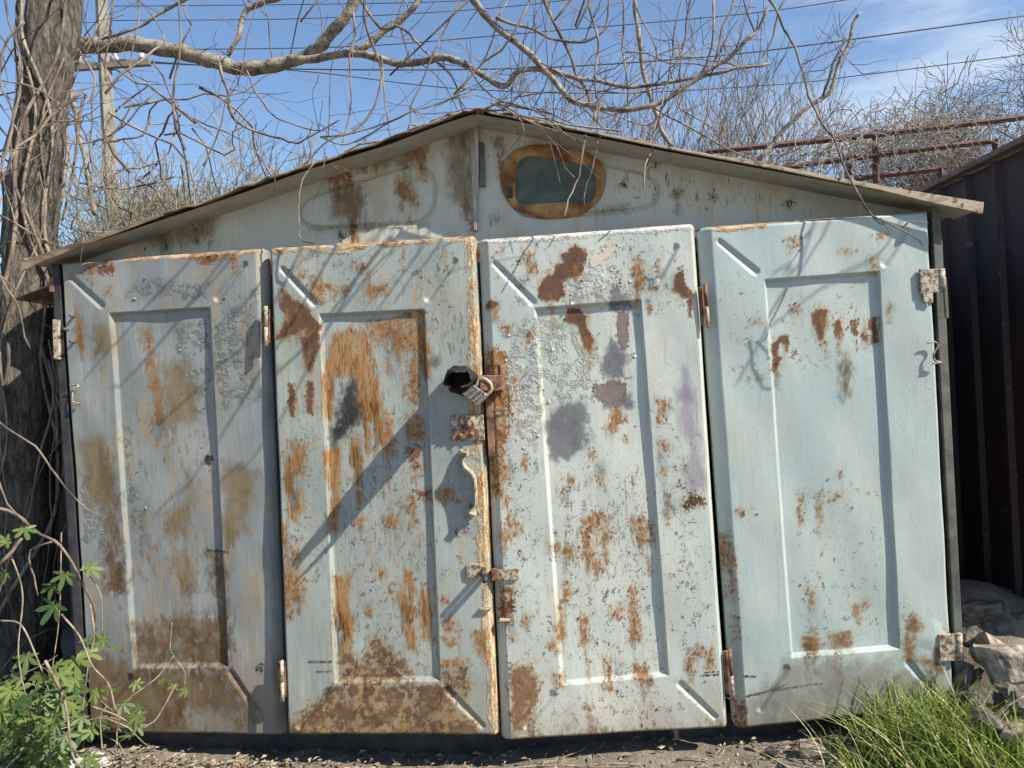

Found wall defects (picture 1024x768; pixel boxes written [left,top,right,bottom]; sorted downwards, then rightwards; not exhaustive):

peeling [126,277,209,299]
peeling [172,288,260,414]
corrosion [68,162,875,738]
peeling [505,243,637,450]
corrosion [787,470,891,692]